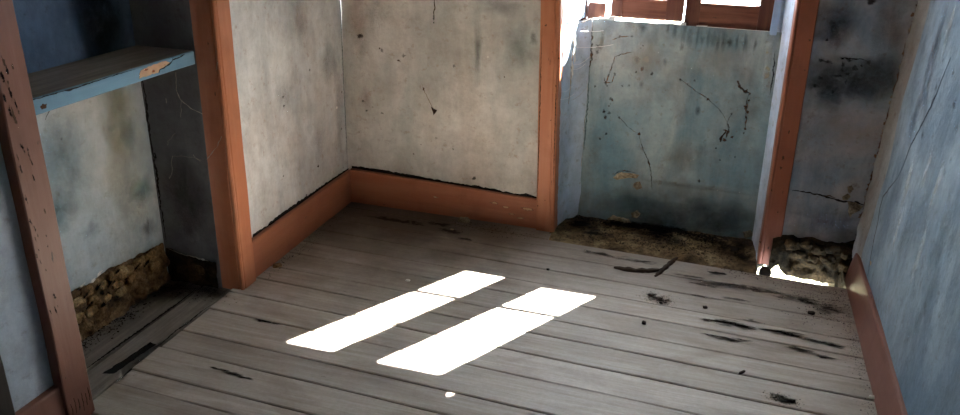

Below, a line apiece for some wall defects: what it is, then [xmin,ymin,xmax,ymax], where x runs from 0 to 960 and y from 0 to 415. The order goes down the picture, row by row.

peeling [139,61,170,79]
crack [584,22,652,186]
crack [680,54,775,142]
crack [792,58,951,276]
flaking render [71,243,218,342]
flaking render [743,230,854,289]